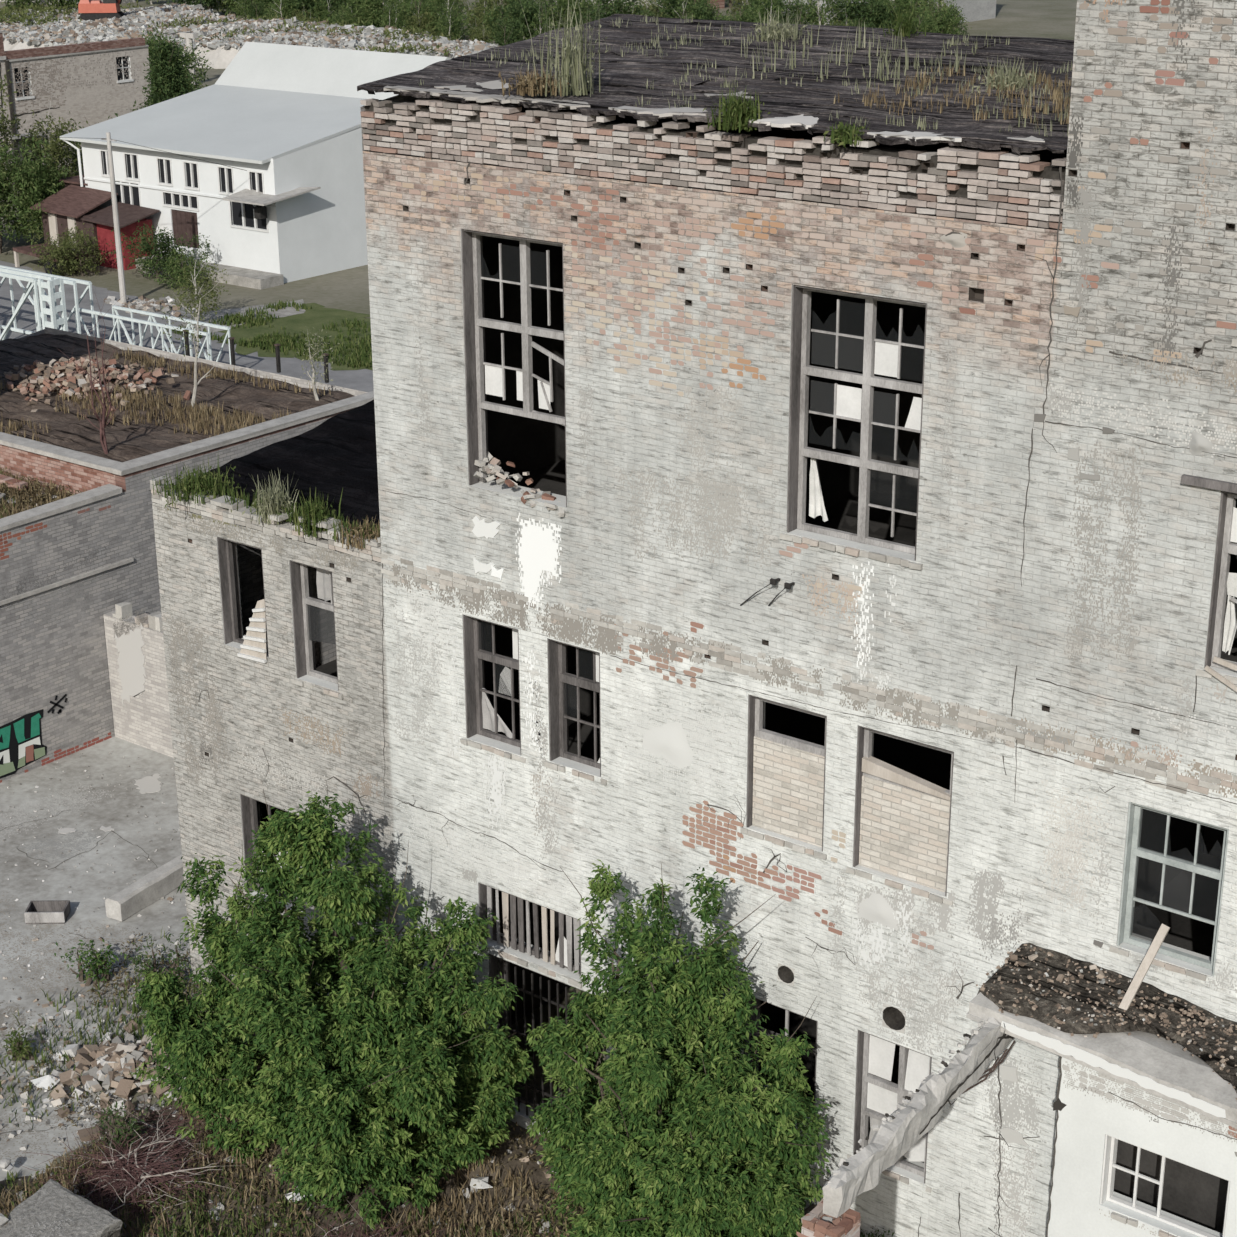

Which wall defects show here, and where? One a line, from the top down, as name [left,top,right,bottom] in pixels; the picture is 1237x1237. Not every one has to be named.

crack [1021,160,1237,587]
spalling [0,522,47,560]
spalling [609,622,711,688]
crack [326,563,563,872]
spalling [682,800,822,902]
spalling [831,829,846,863]
crack [920,1024,1062,1237]